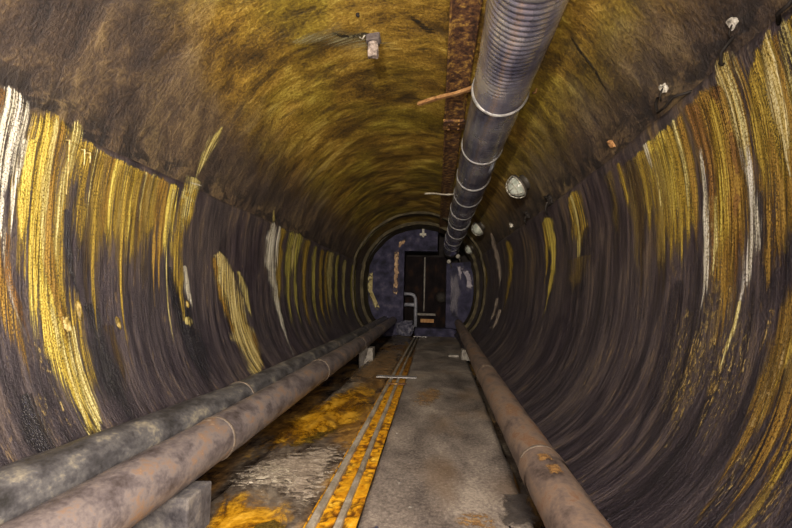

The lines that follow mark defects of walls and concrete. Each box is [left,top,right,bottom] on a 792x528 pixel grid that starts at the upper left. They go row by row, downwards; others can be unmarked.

damp [0,86,223,435]
damp [212,251,264,374]
damp [542,217,556,305]
damp [568,191,589,311]
damp [607,116,699,289]
damp [709,16,792,367]